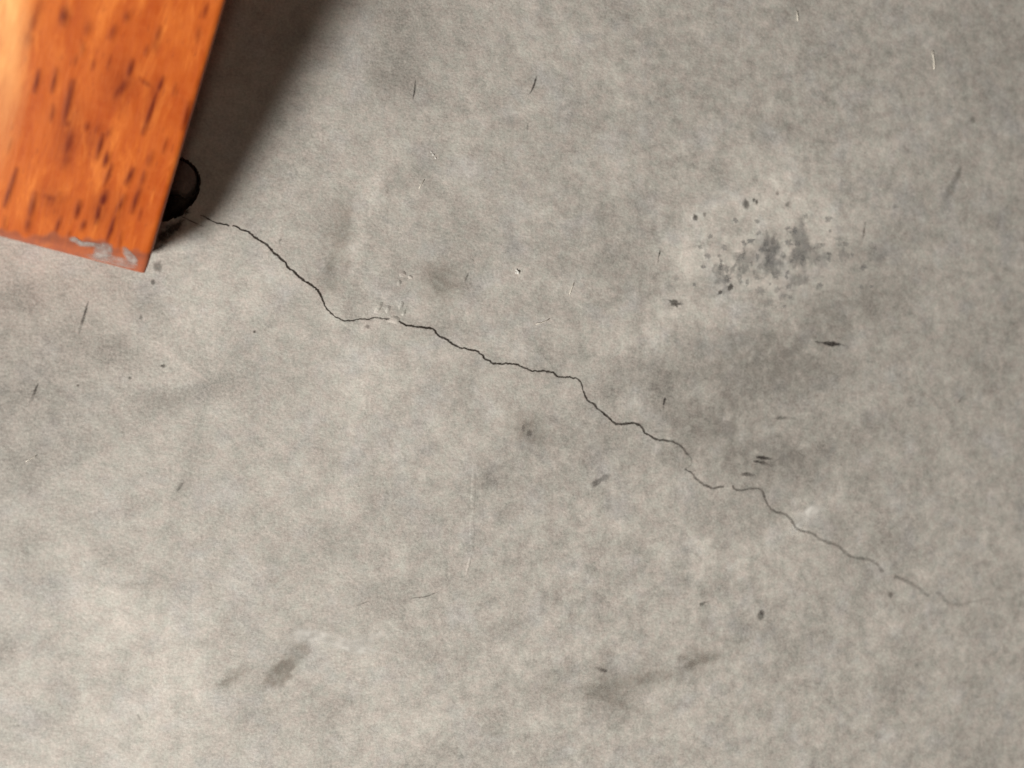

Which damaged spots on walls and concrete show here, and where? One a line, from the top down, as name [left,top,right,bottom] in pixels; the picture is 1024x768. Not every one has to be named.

crack [183,215,709,487]